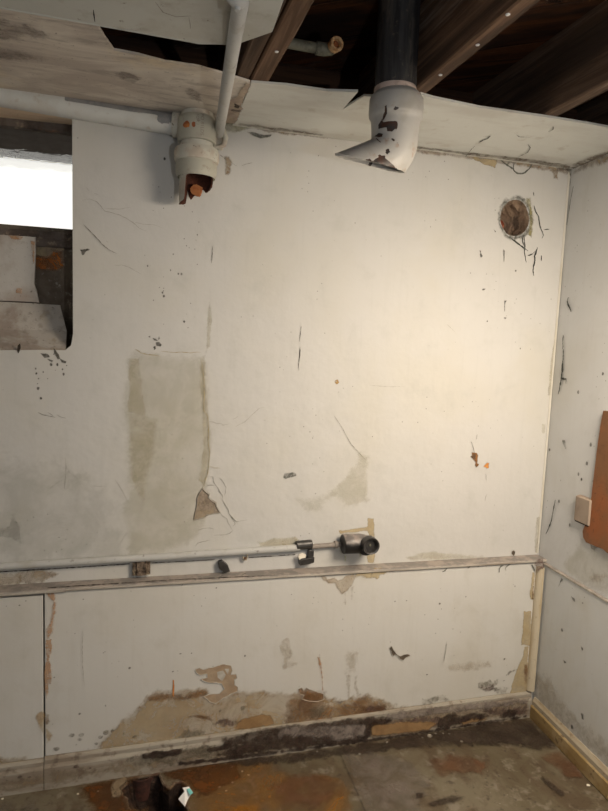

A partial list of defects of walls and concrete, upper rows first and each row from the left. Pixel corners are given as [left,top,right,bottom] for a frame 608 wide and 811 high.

crack [136,349,256,544]
spalling [193,488,220,520]
peeling [195,664,238,704]
peeling [298,688,324,702]
leakage [101,611,581,811]